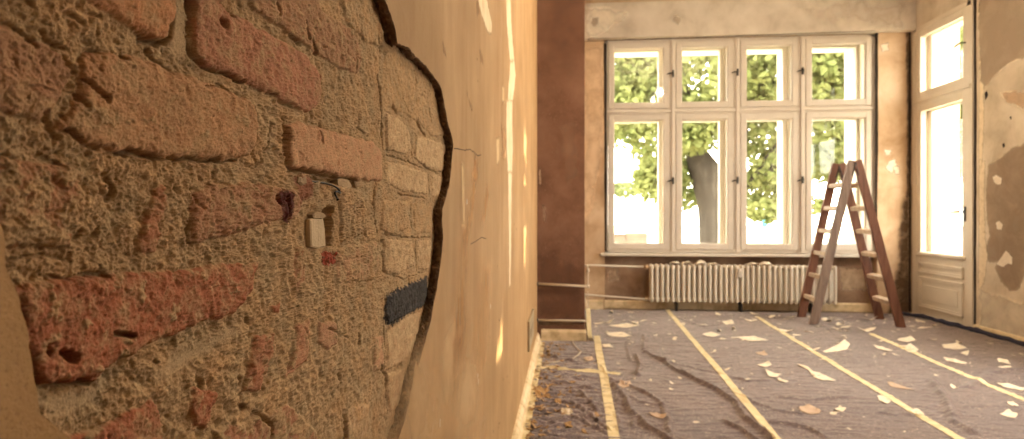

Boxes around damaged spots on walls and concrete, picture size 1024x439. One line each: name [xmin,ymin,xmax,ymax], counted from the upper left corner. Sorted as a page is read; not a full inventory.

spalling [0,0,453,439]
peeling [978,0,1024,291]